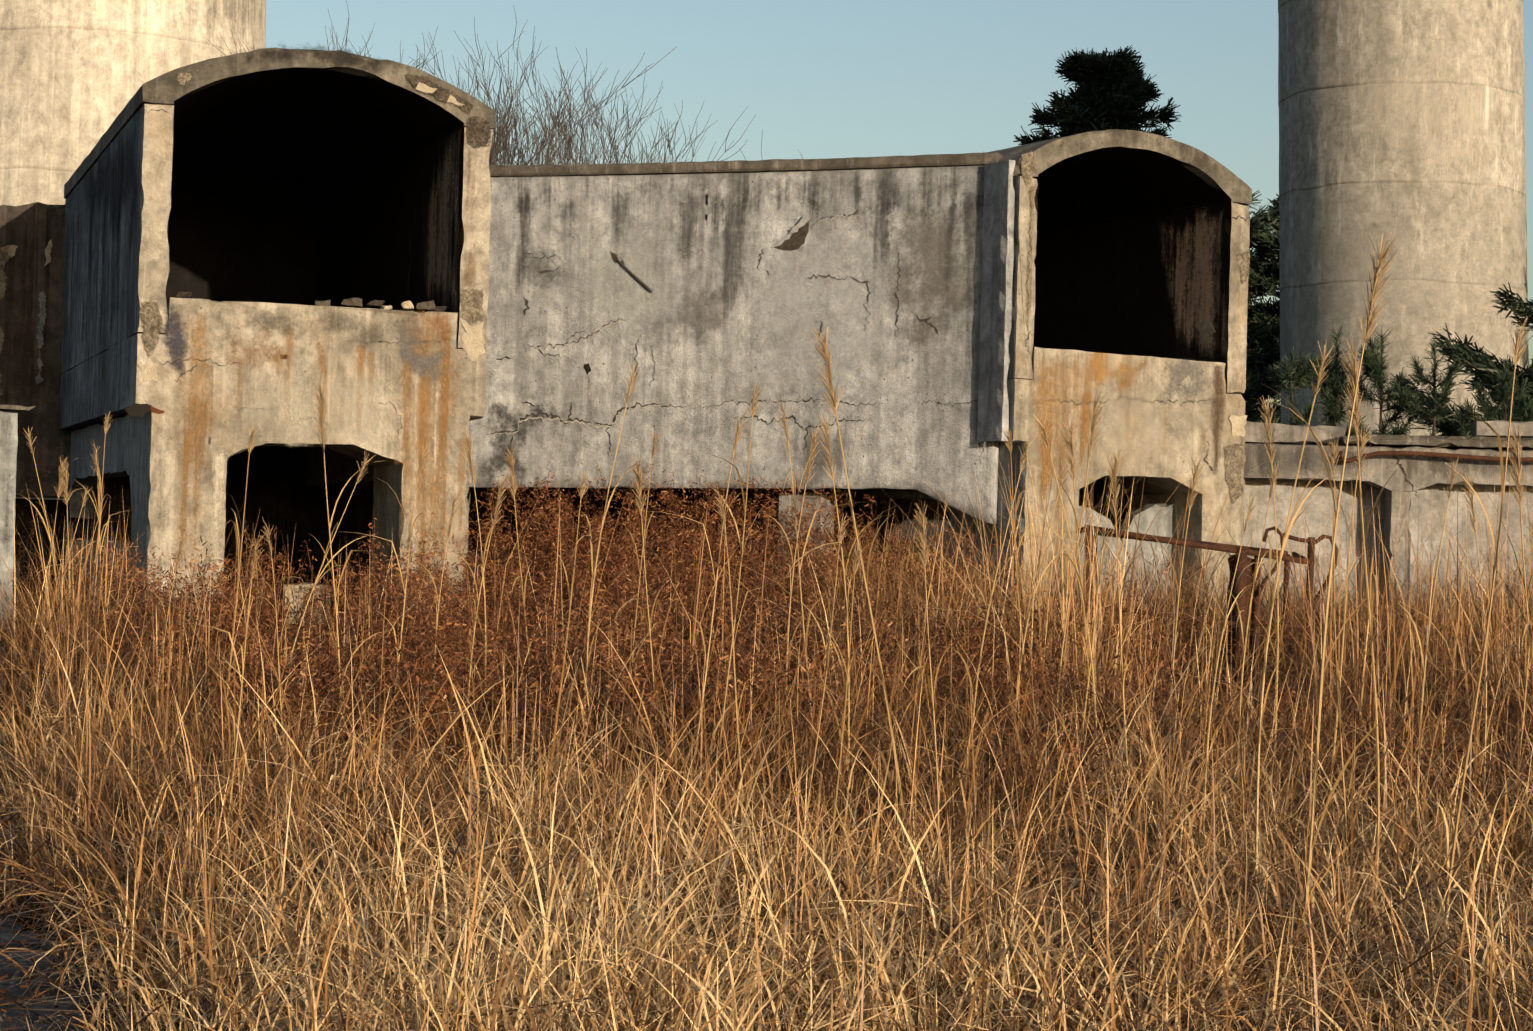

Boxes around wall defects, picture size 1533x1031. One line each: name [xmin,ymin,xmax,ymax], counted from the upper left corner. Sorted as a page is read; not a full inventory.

damp [248,46,380,66]
peeling [0,244,18,303]
rust [403,314,464,574]
rust [426,141,459,304]
crack [487,253,885,460]
spalling [771,215,810,251]
crack [806,252,938,335]
rust [1037,354,1130,499]